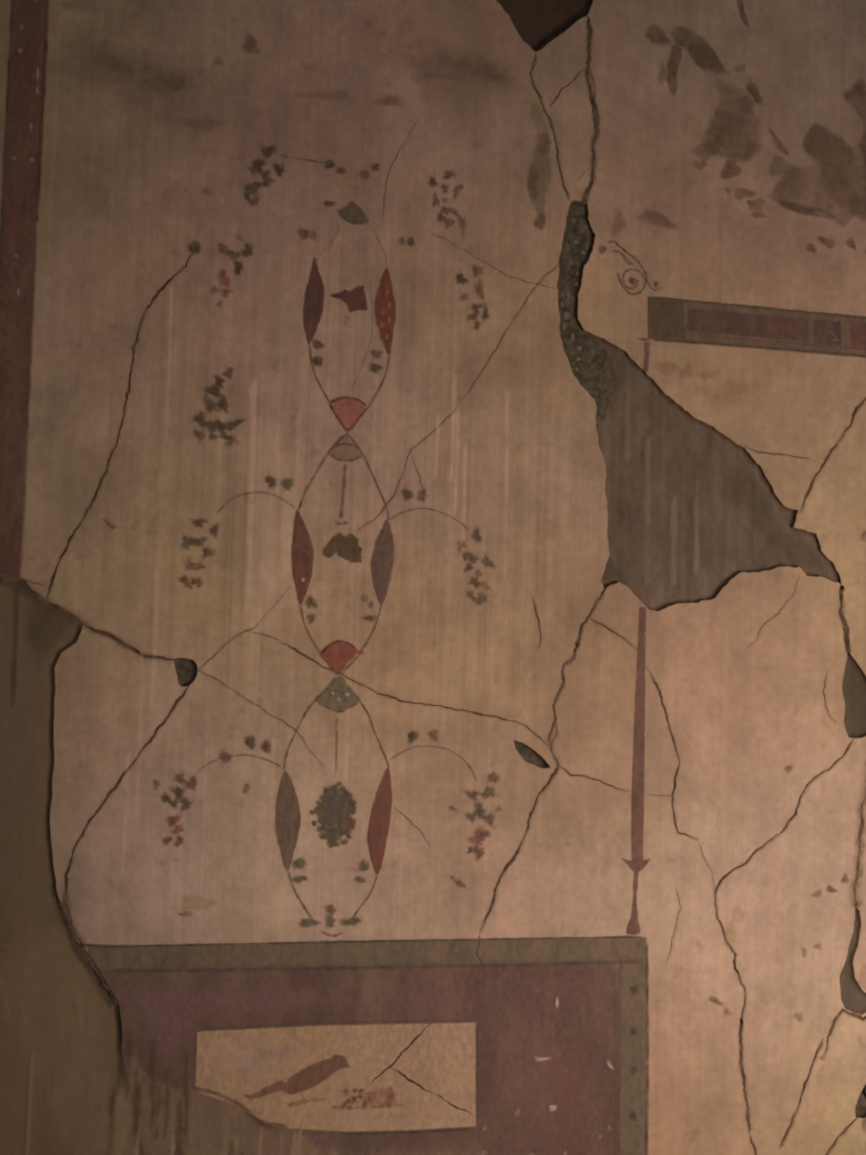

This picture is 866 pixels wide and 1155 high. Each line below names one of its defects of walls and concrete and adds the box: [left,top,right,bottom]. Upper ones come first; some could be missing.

flaking render [496,0,593,52]
crack [530,17,599,205]
flaking render [557,200,842,611]
flaking render [174,658,198,687]
crack [0,231,866,1155]
flaking render [842,651,866,738]
flaking render [513,740,551,768]
flaking render [855,1084,866,1118]